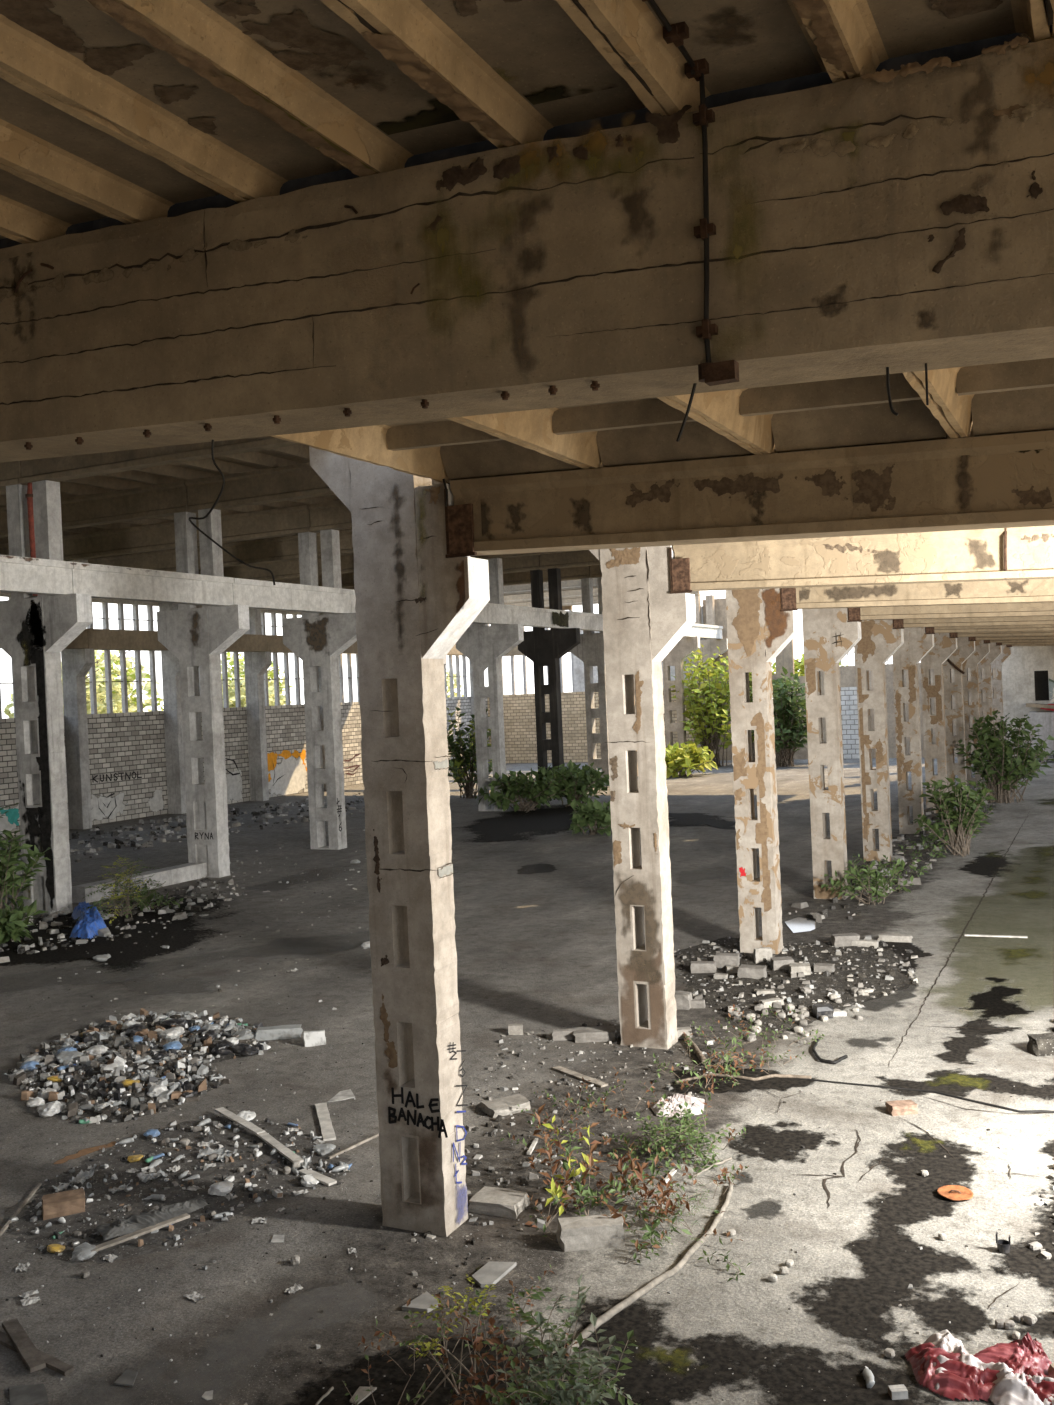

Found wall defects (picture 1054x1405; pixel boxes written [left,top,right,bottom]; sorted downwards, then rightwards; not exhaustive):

spalling [0,0,377,177]
peeling [214,0,521,191]
crack [0,115,946,325]
crack [0,209,1054,405]
water stain [510,248,544,369]
water stain [623,190,654,238]
crack [750,153,1054,204]
peeling [732,589,762,656]
water stain [0,600,237,972]
peeling [857,620,942,852]
water stain [876,977,1054,1100]
crack [803,1130,884,1208]